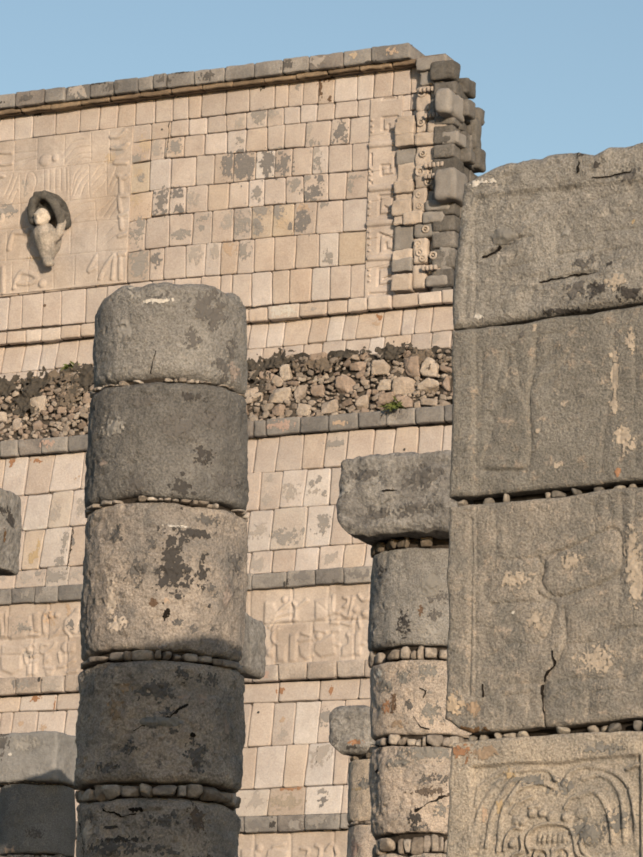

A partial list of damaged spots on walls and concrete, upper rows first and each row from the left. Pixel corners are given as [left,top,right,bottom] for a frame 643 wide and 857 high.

crack [541,650,556,728]